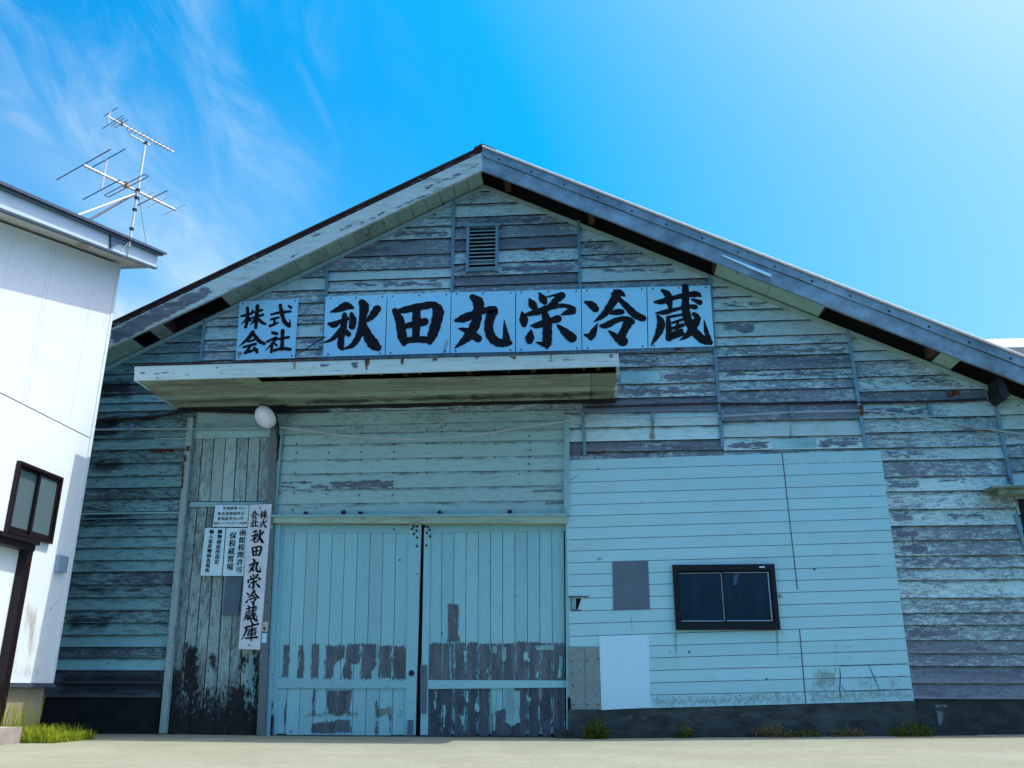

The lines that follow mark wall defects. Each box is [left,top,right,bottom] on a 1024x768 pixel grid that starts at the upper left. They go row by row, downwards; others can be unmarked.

peeling [111,287,213,342]
peeling [723,323,755,333]
damp [92,459,123,471]
peeling [282,480,394,489]
damp [84,506,132,523]
peeling [892,511,957,566]
damp [67,615,112,629]
damp [59,642,260,735]
peeling [281,643,406,734]
peeling [427,603,565,736]